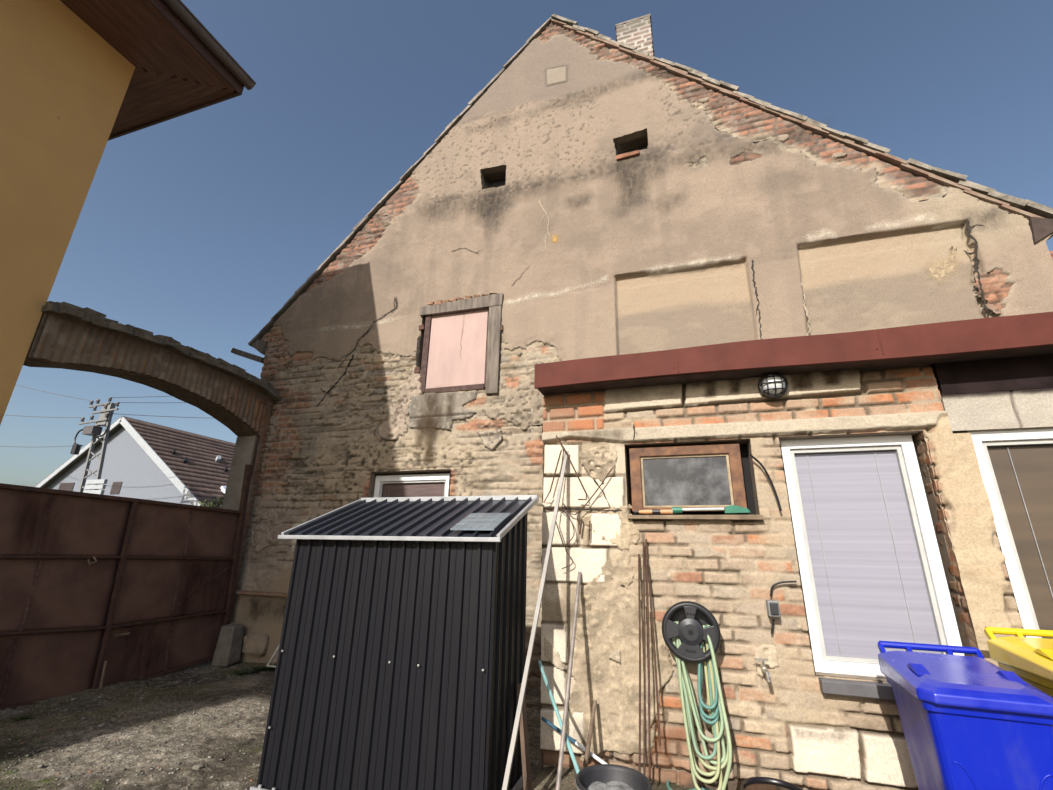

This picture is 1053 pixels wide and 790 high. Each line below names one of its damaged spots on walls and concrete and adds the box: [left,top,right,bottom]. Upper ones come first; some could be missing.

flaking render [536,22,949,202]
flaking render [305,174,420,293]
crack [950,220,989,318]
flaking render [973,269,1014,314]
crack [317,298,398,407]
flaking render [237,326,674,762]